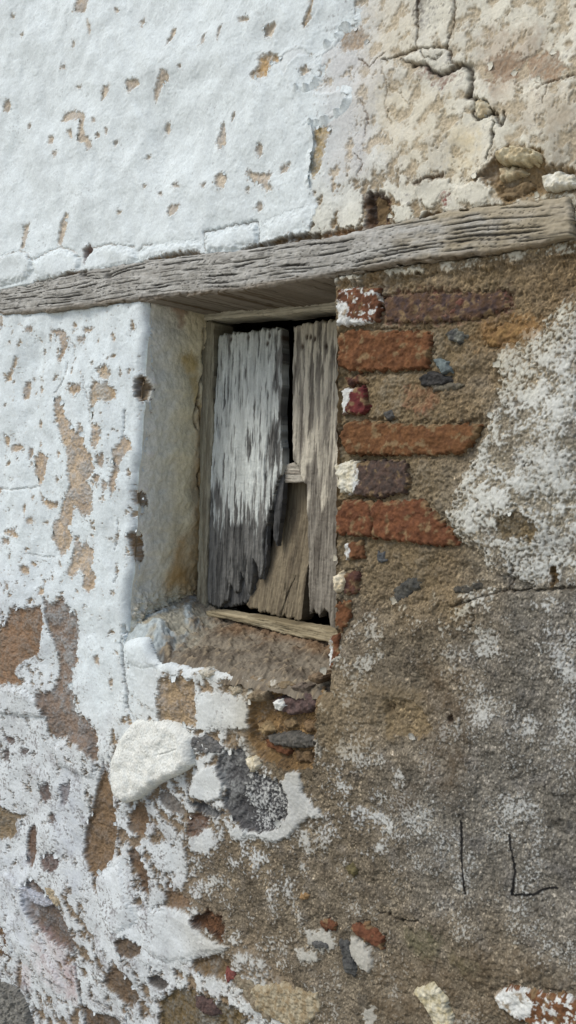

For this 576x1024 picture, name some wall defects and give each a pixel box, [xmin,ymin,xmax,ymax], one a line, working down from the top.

peeling [249,21,282,80]
crack [353,0,507,180]
spalling [238,224,365,251]
peeling [1,362,134,594]
spalling [333,249,576,650]
peeling [0,581,98,752]
crack [448,561,576,632]
spalling [153,667,327,841]
spalling [0,781,78,962]
peeling [82,770,192,912]
peeling [100,935,142,1010]
spalling [157,953,249,1024]